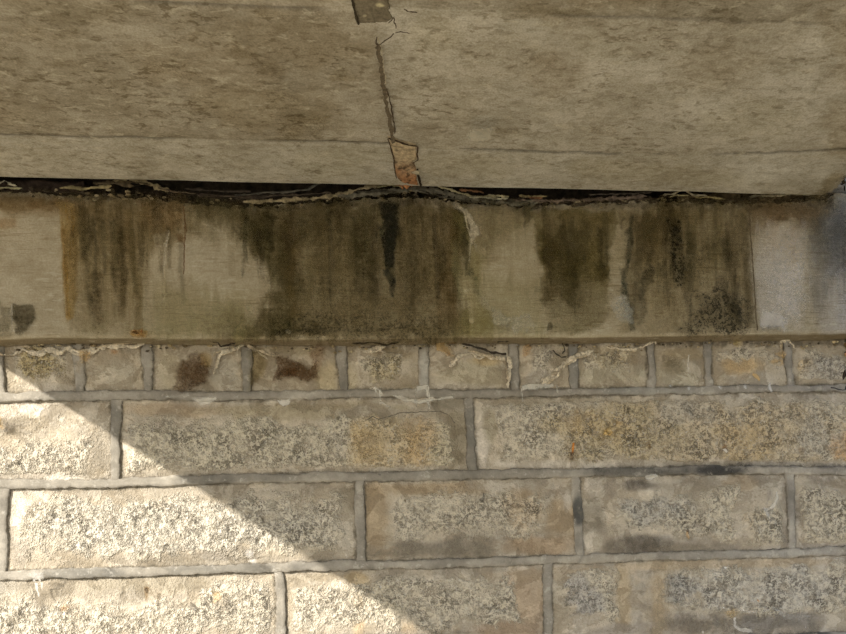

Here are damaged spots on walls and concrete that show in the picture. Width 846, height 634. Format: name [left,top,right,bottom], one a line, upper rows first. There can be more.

spalling [351,0,393,25]
crack [375,9,418,45]
crack [387,138,422,186]
rust [59,202,78,321]
leakage [0,183,777,345]
efflorescence [521,384,558,401]